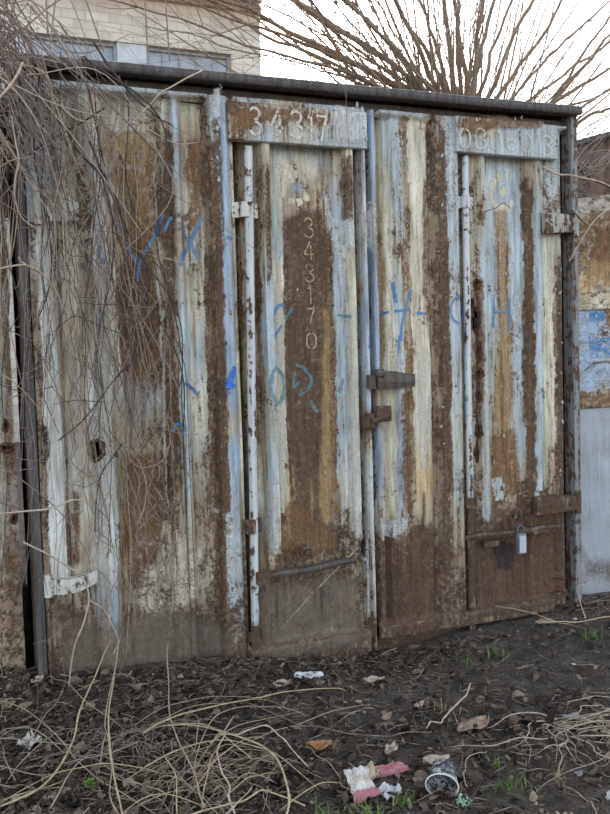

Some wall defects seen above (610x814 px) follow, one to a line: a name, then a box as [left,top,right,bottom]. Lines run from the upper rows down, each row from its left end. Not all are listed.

rust [2,196,12,442]
rust [104,128,180,617]
rust [186,141,202,262]
rust [200,117,230,624]
rust [254,170,273,299]
rust [231,108,329,134]
rust [281,211,337,588]
rust [383,126,566,636]
rust [461,116,545,140]
peeling [584,332,610,373]